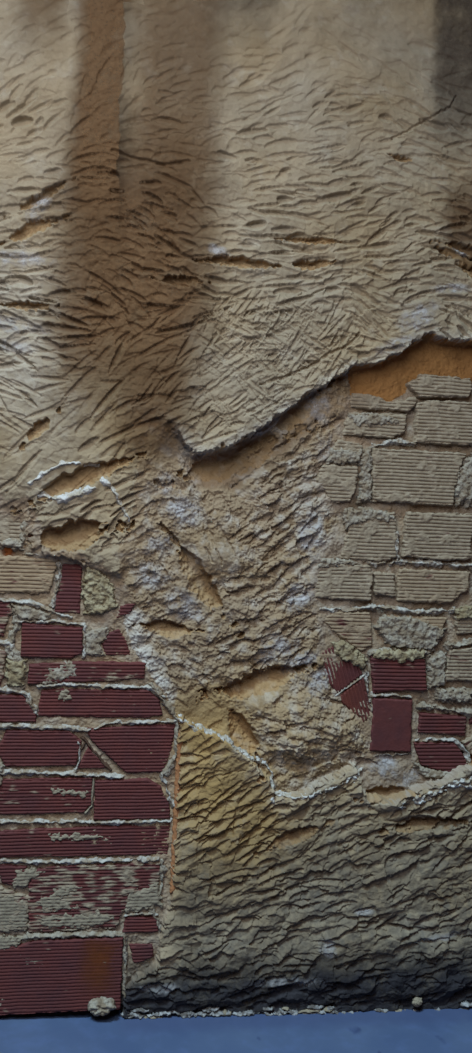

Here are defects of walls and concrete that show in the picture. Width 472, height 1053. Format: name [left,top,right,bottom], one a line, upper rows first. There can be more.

spalling [1,301,60,312]
spalling [0,333,472,1019]